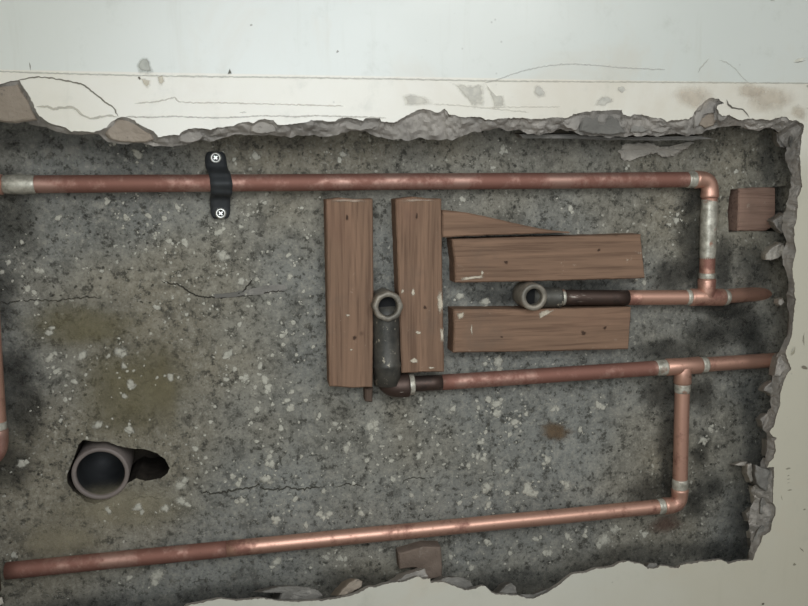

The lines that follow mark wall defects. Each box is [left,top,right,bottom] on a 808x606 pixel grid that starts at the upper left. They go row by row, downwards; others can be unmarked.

crack [20,76,119,119]
spalling [0,80,799,147]
crack [162,279,285,299]
spalling [490,122,804,599]
spalling [184,568,485,606]